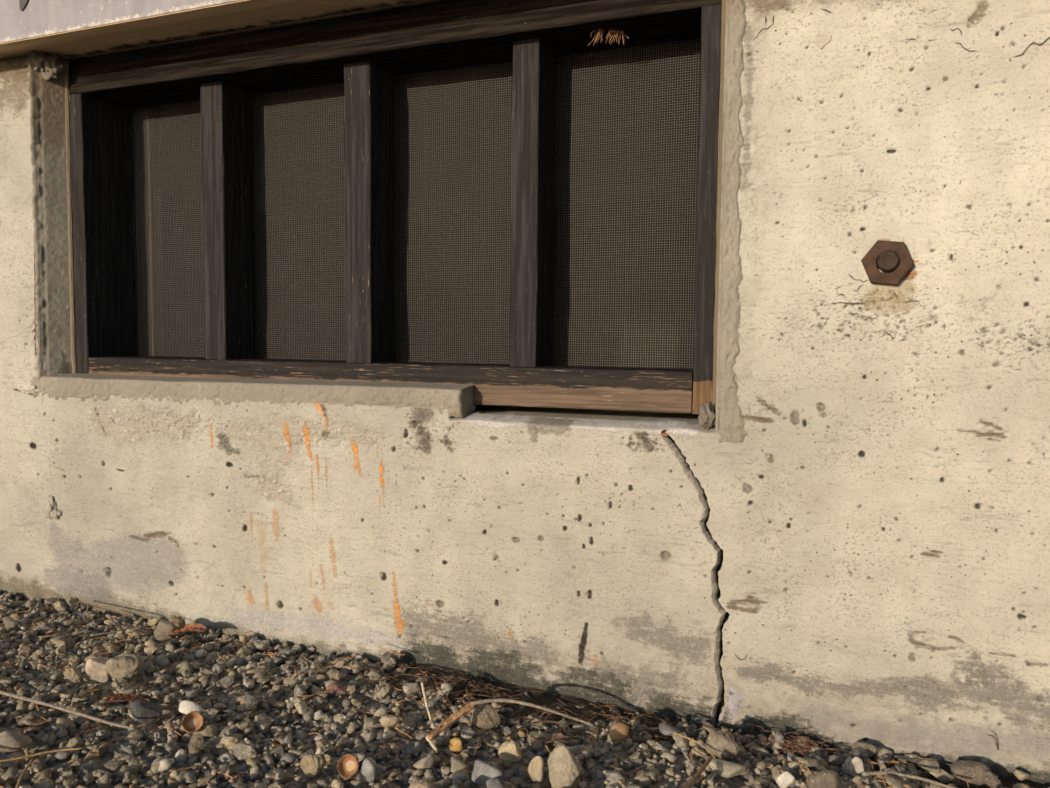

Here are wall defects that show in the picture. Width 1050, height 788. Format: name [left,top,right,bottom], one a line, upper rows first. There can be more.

corrosion [303,424,319,483]
corrosion [351,436,361,476]
crack [659,431,748,727]
water stain [578,623,588,663]
water stain [909,631,961,650]
water stain [738,652,1050,727]